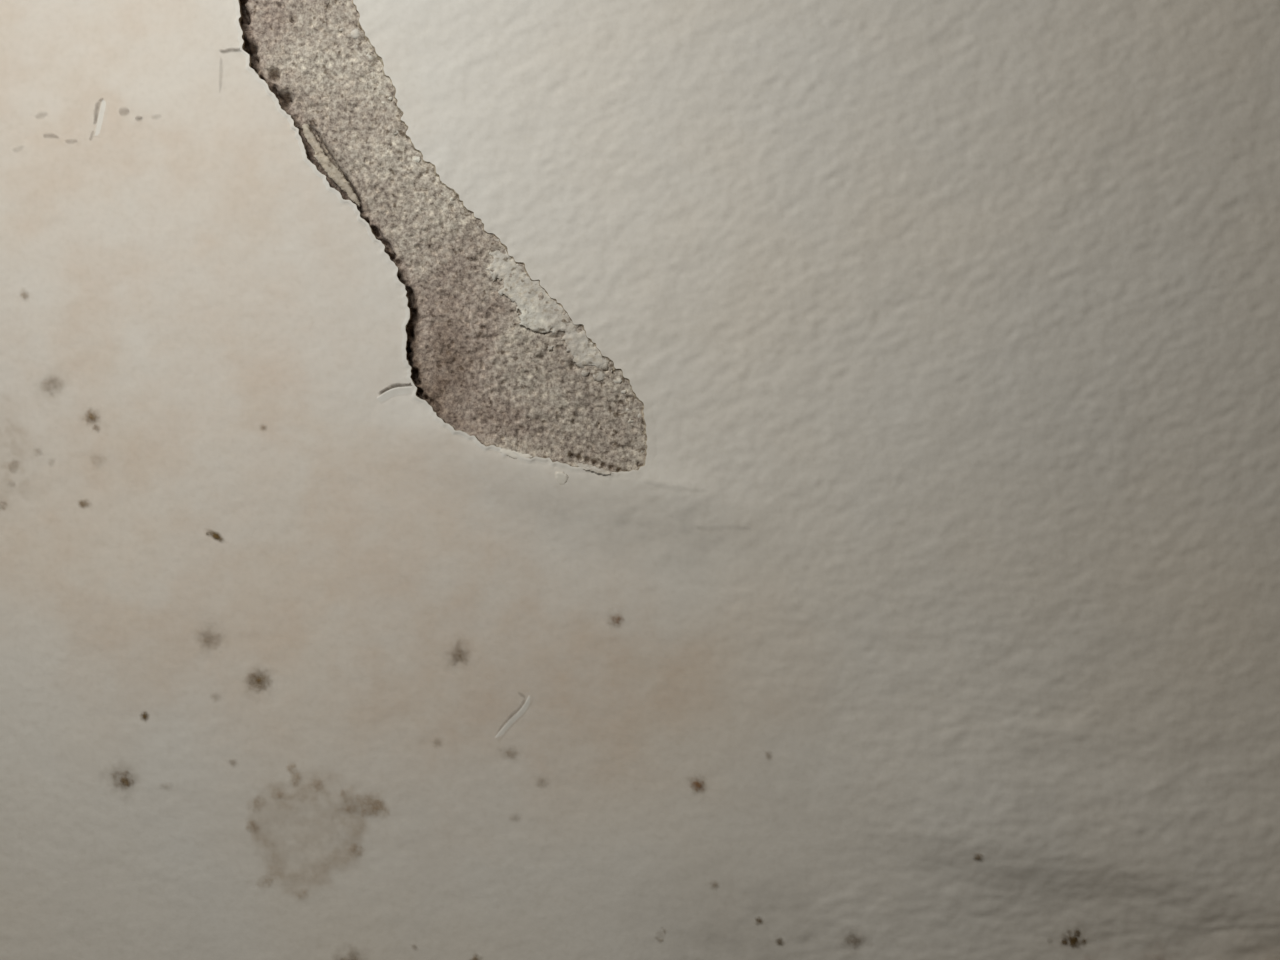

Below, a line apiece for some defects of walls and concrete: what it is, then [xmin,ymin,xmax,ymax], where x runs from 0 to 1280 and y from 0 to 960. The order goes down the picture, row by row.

peeling [229,0,657,485]